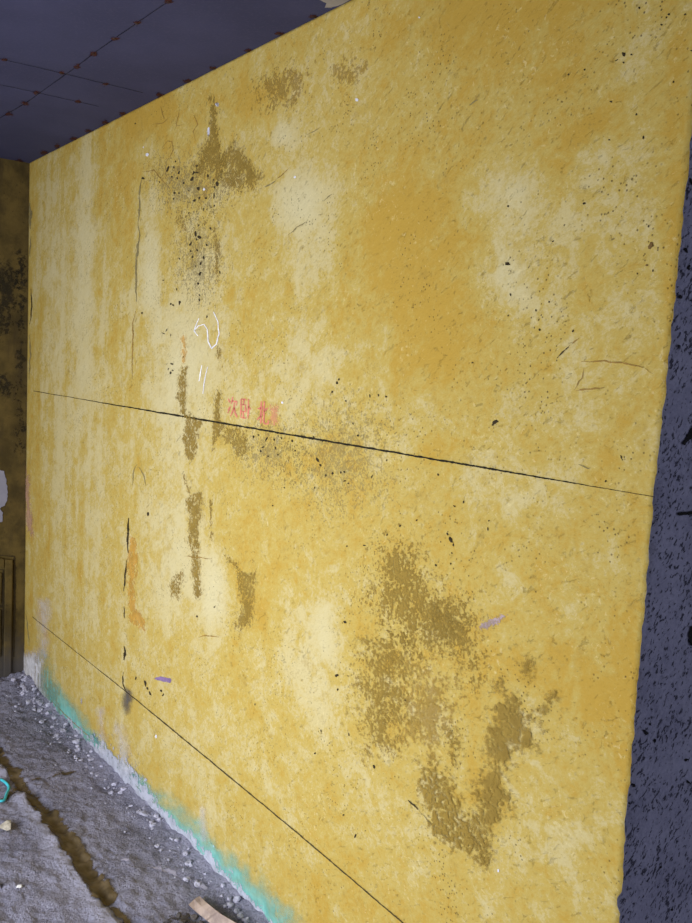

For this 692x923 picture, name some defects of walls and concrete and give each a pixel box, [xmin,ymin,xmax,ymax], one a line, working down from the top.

leakage [195,96,261,190]
crack [132,106,198,365]
leakage [175,366,247,461]
peeling [0,470,8,522]
crack [122,518,130,614]
leakage [170,475,213,600]
leakage [227,557,255,631]
leakage [352,531,557,871]